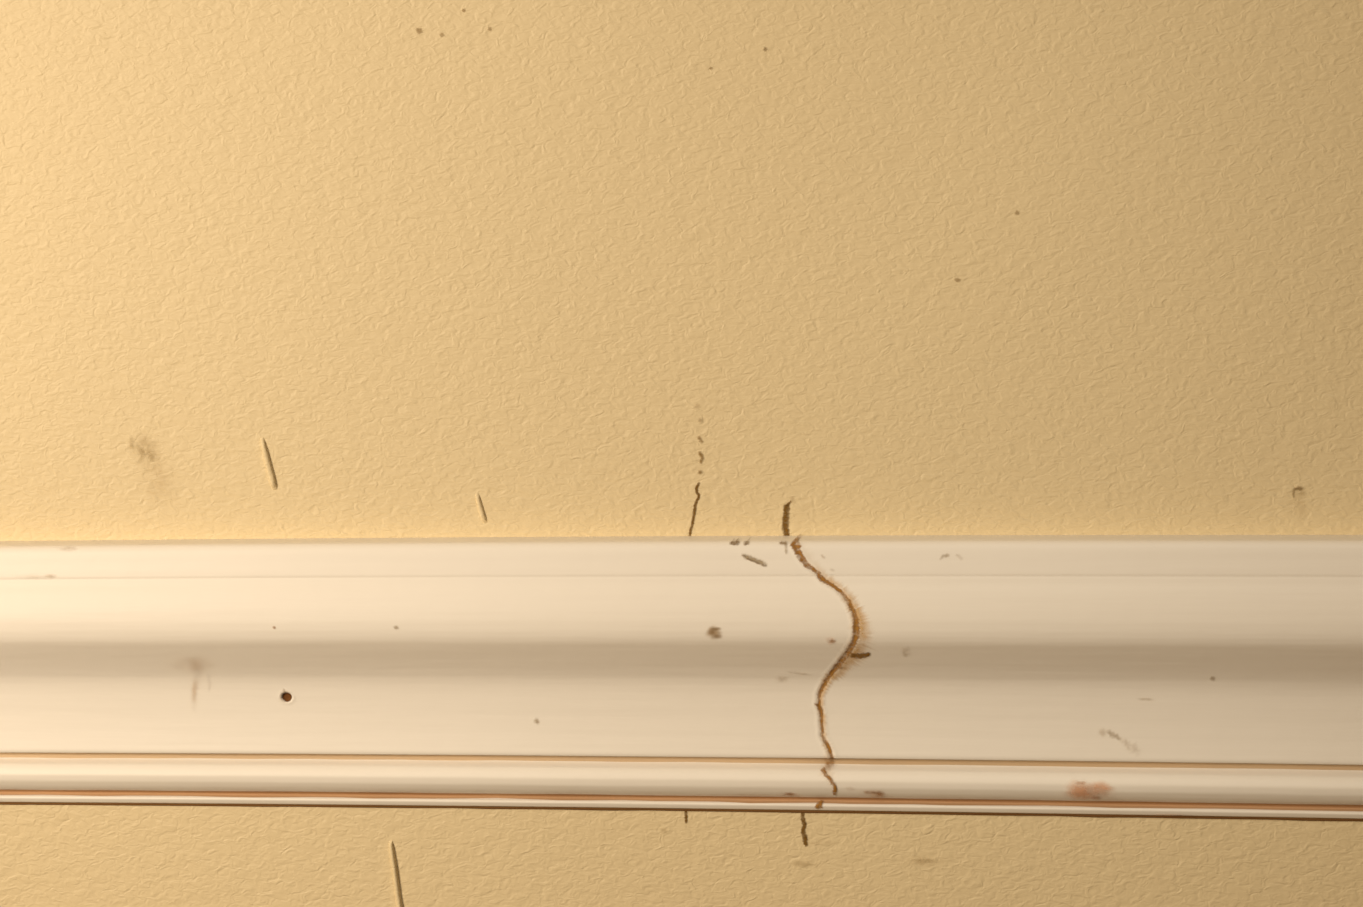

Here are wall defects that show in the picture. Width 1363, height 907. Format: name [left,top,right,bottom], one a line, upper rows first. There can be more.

crack [689,438,703,536]
crack [780,501,870,846]